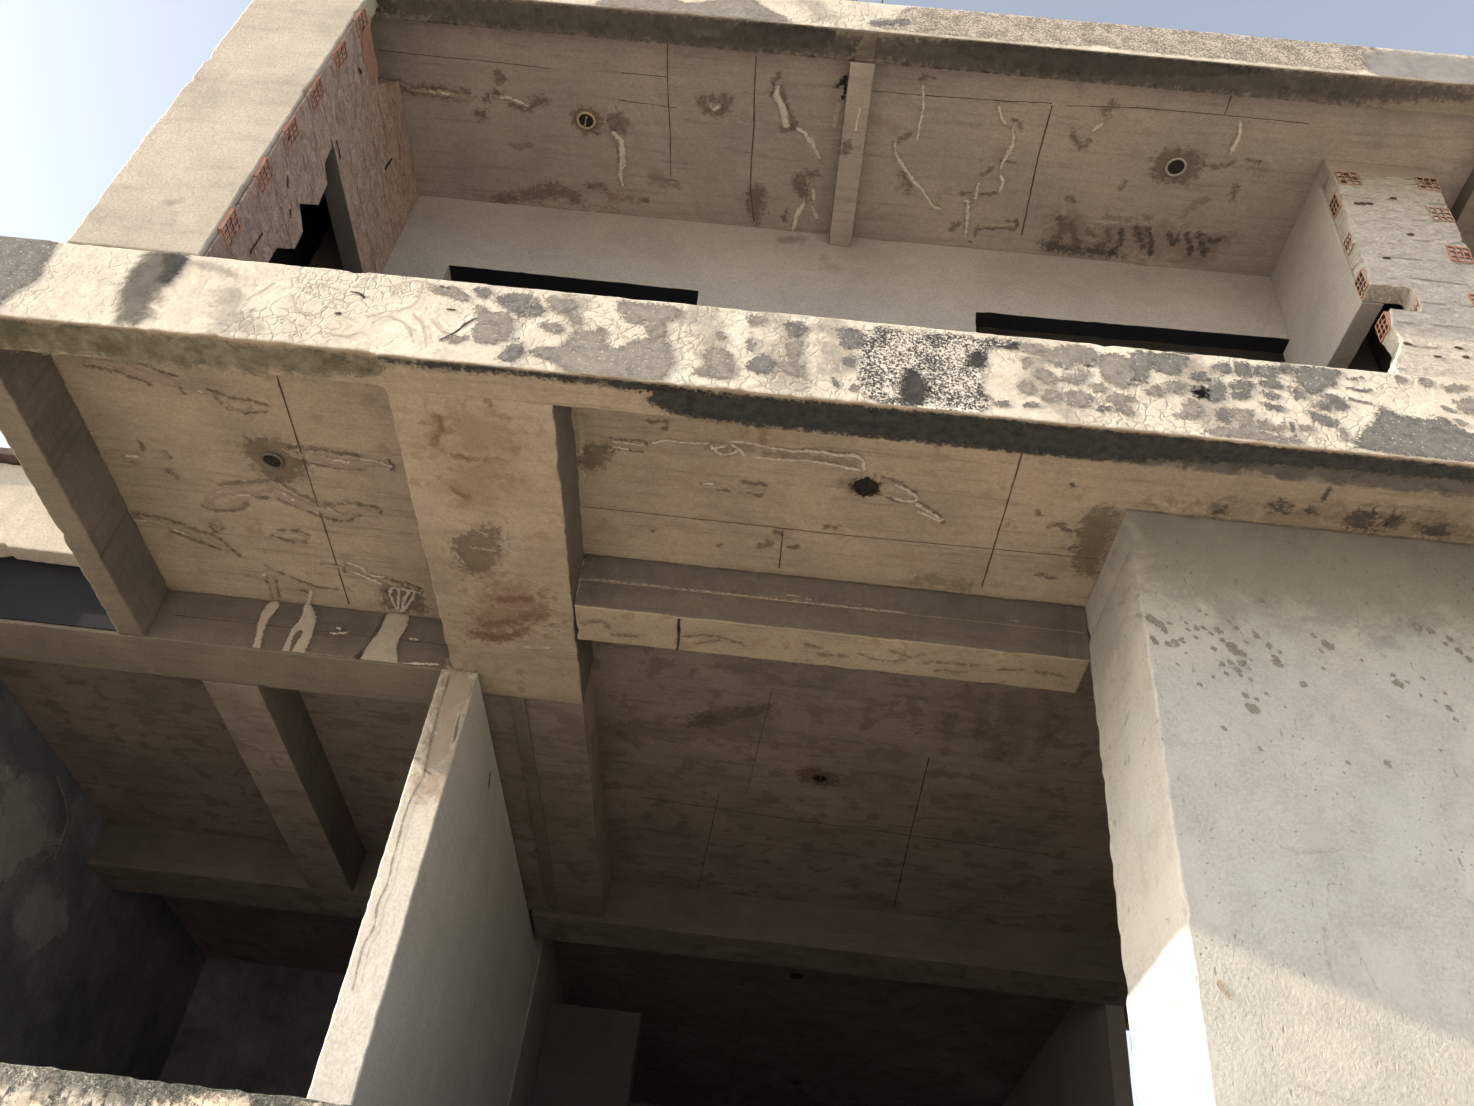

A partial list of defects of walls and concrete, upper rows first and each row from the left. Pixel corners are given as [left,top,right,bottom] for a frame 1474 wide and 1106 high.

spalling [362,27,379,83]
damp [375,0,1474,243]
crack [250,176,291,254]
damp [1040,196,1225,258]
crack [246,272,476,347]
peeling [426,284,808,381]
damp [0,251,1474,538]
peeling [832,325,866,393]
peeling [992,342,1474,463]
damp [450,526,507,576]
damp [1036,505,1120,576]
damp [132,479,476,799]